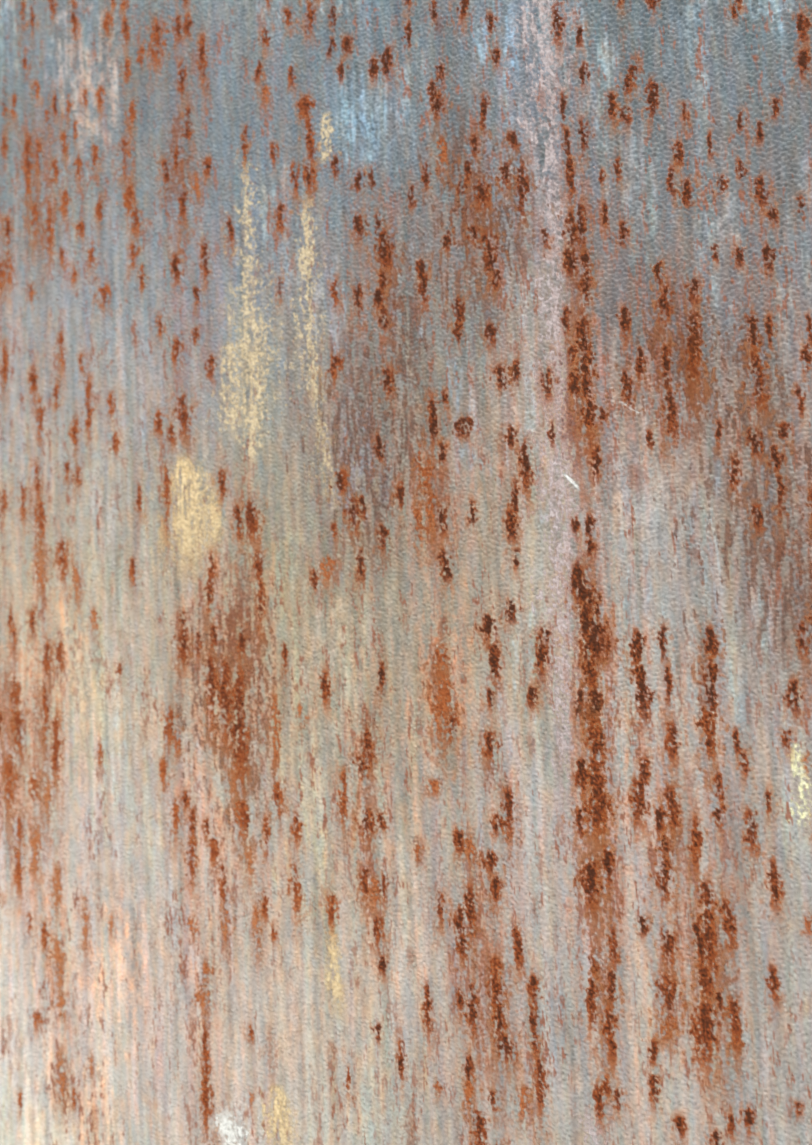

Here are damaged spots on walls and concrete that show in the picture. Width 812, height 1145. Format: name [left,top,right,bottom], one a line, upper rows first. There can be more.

corrosion [21,57,106,284]
corrosion [103,0,208,184]
corrosion [456,94,533,216]
corrosion [540,92,609,481]
corrosion [620,261,706,439]
corrosion [0,640,65,894]
corrosion [173,469,303,875]
corrosion [436,828,503,961]
corrosion [475,599,521,710]
corrosion [567,513,744,1124]
corrosion [743,790,785,910]
corrosion [456,926,550,1120]